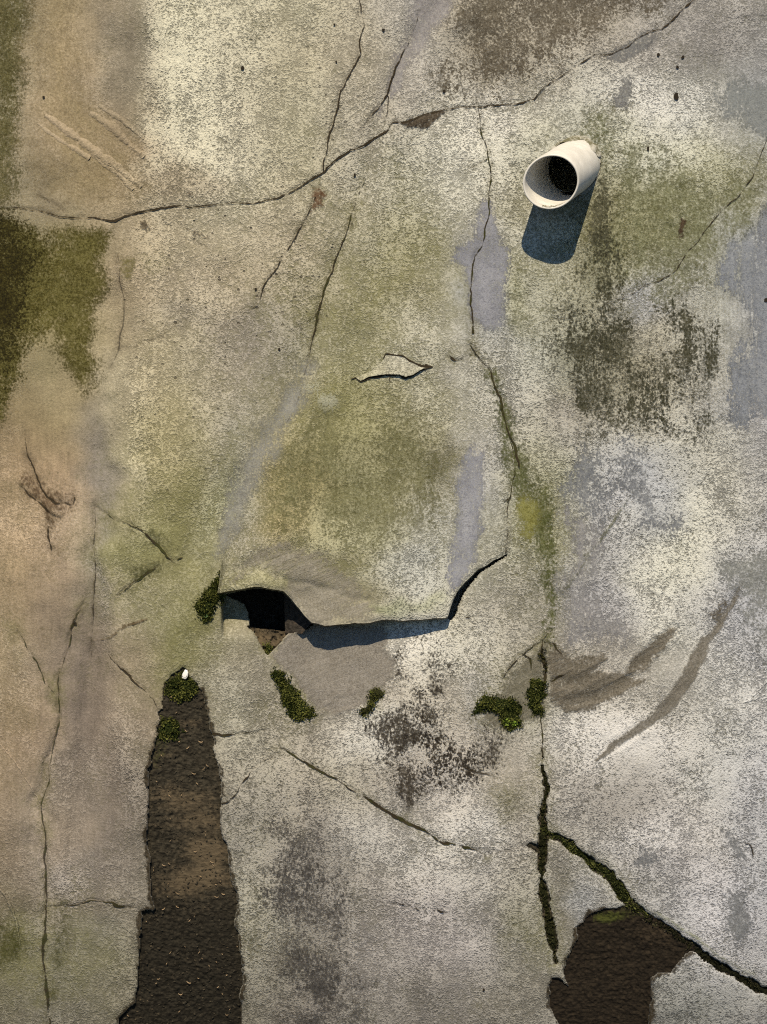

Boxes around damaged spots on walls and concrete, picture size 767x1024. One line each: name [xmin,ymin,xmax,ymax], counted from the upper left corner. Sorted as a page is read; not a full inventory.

water stain [388,0,666,107]
crack [5,0,694,552]
water stain [542,170,767,443]
crack [622,140,767,299]
spalling [226,542,397,715]
crack [21,514,183,1024]
flaking render [115,667,246,1024]
crack [221,748,502,857]
flaking render [546,899,695,1024]
crack [504,634,767,995]